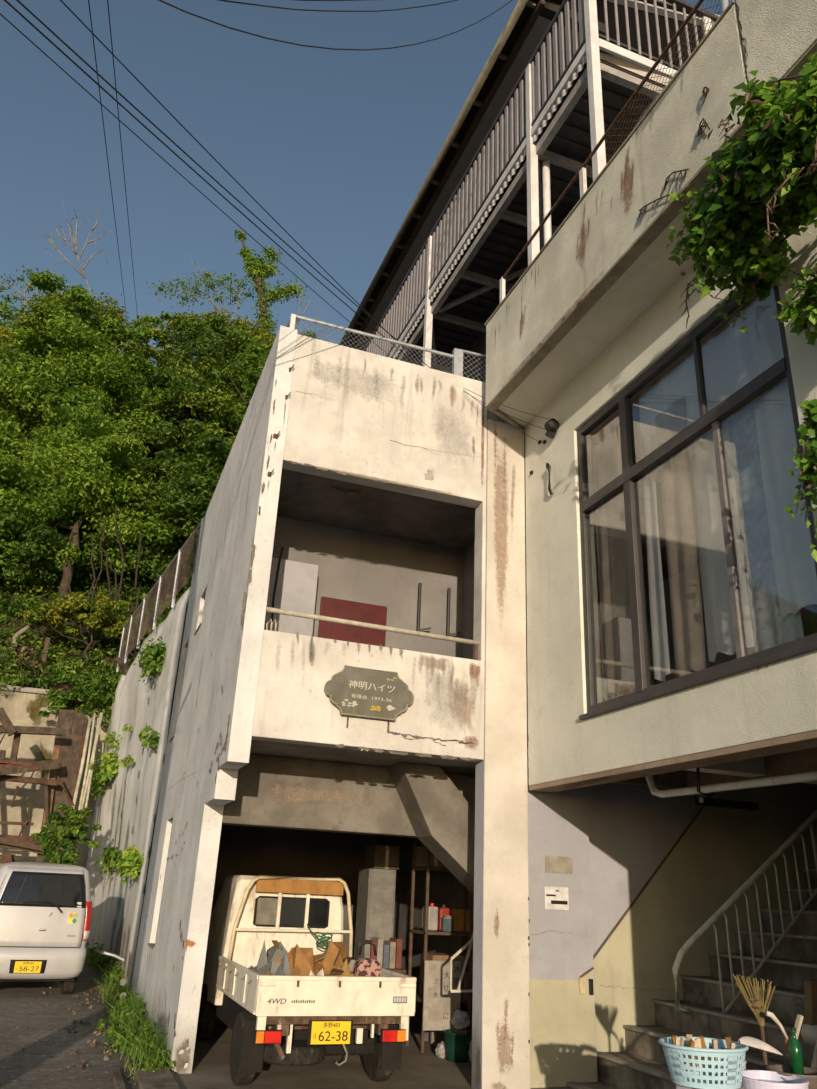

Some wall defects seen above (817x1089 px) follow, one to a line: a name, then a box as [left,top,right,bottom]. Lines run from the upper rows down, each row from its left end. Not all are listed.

crack [735,0,749,82]
rust [621,151,634,209]
rust [576,206,590,261]
spalling [241,537,257,627]
peeling [209,715,230,783]
crack [388,720,474,766]